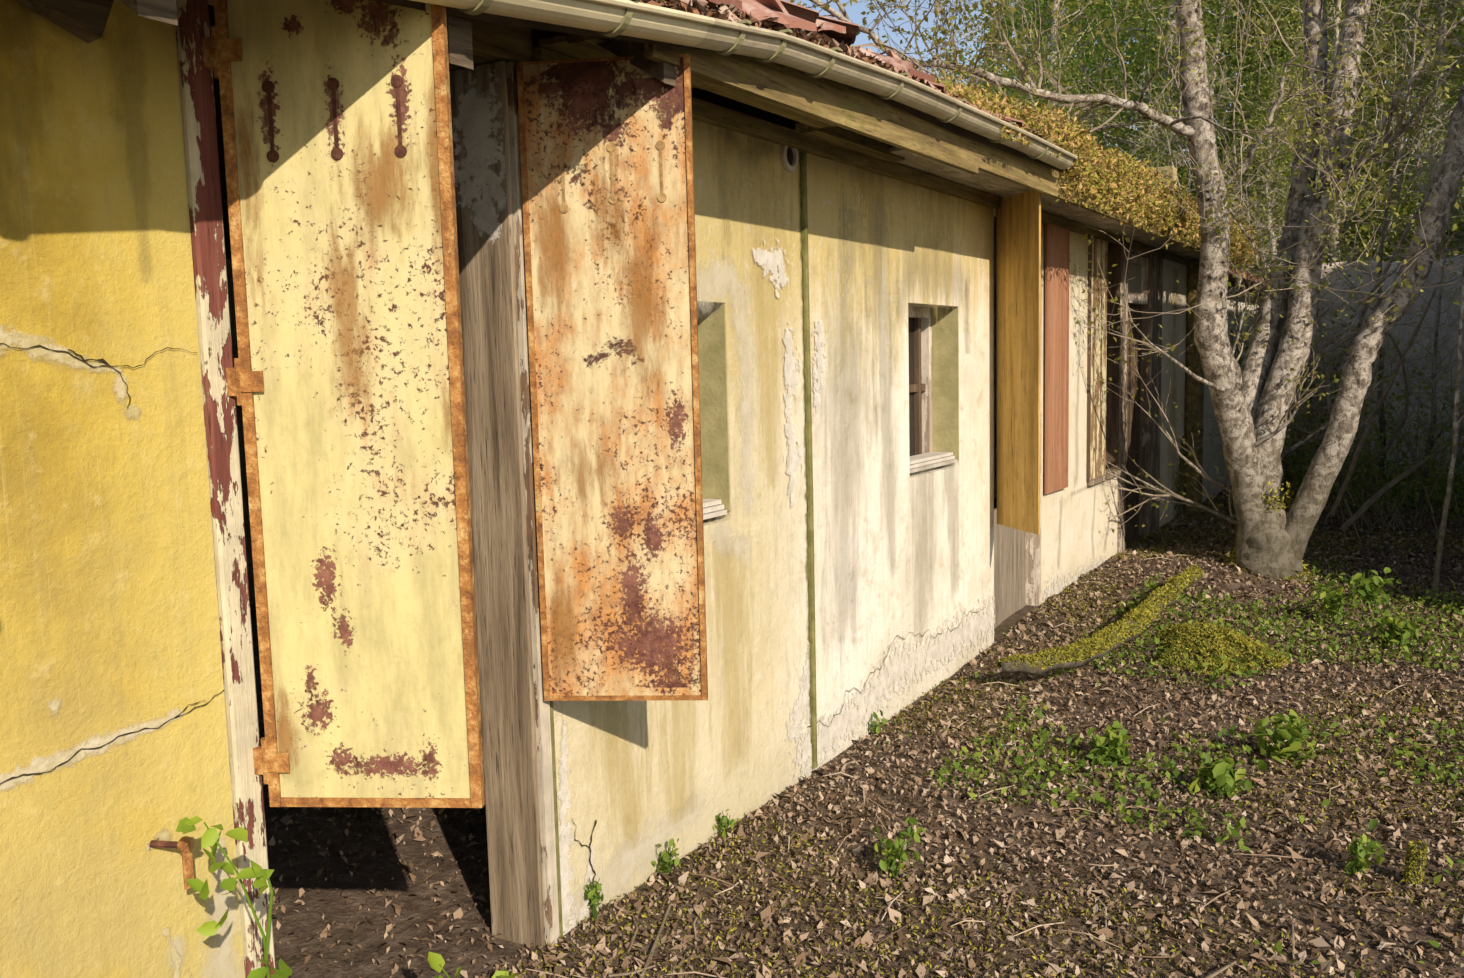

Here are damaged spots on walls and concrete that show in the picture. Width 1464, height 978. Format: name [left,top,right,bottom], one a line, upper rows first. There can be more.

rust [320,0,412,225]
rust [429,91,441,232]
rust [527,76,682,148]
rust [536,205,567,295]
peeling [752,239,789,298]
crack [0,326,197,418]
rust [663,386,689,458]
rust [312,546,357,652]
rust [578,460,697,688]
leakage [804,366,812,741]
crack [0,690,224,791]
rust [278,665,443,789]